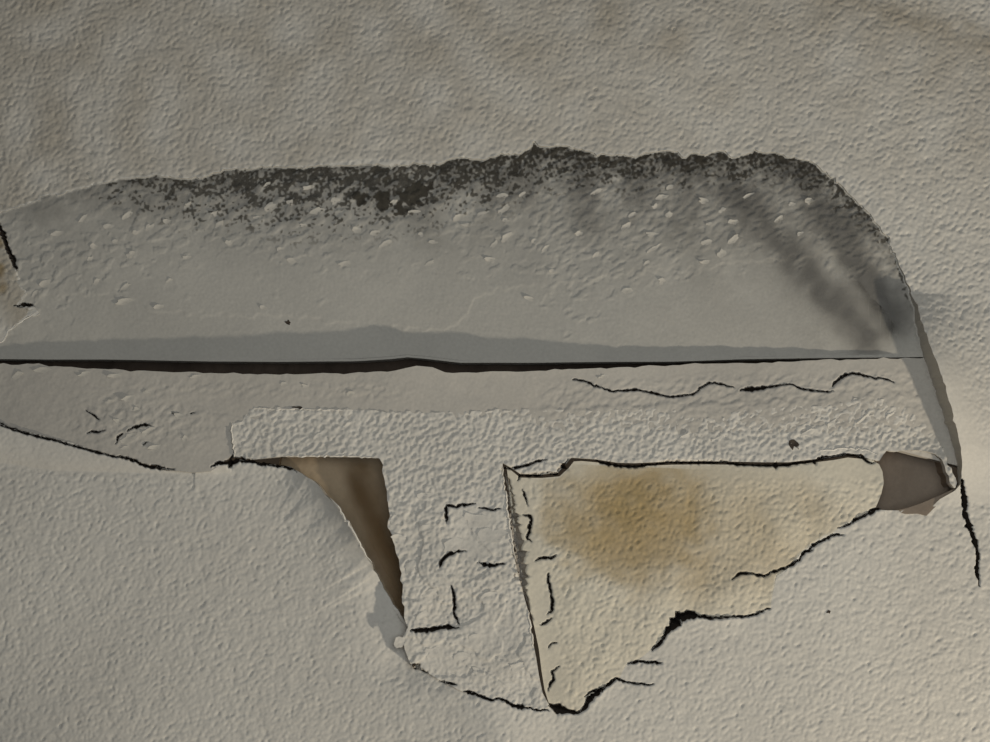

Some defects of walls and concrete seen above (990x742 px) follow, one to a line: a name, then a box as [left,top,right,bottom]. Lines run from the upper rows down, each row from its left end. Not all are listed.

crack [0,226,18,271]
crack [0,355,894,398]
crack [0,410,194,470]
crack [212,456,297,473]
peeling [0,141,957,712]
crack [594,453,873,469]
crack [732,508,881,580]
crack [960,479,980,586]
crack [410,459,769,715]